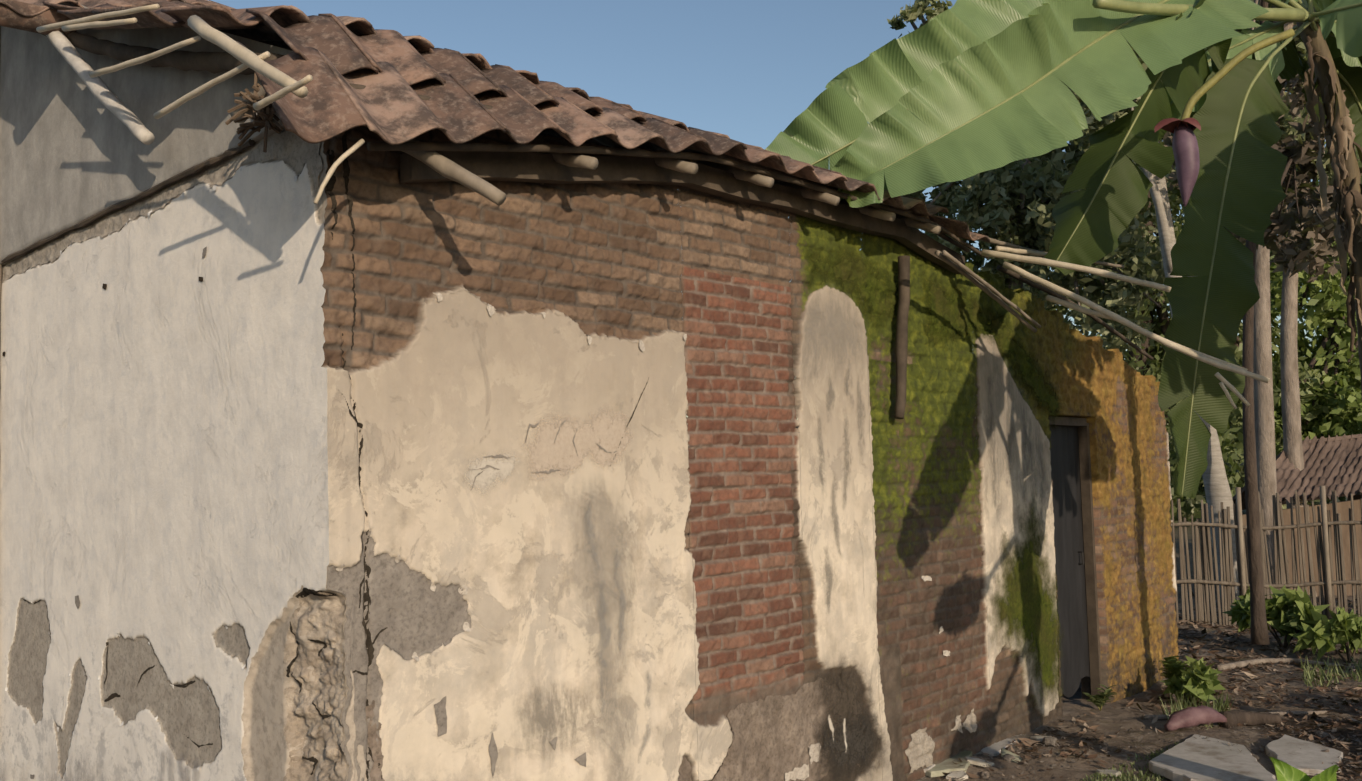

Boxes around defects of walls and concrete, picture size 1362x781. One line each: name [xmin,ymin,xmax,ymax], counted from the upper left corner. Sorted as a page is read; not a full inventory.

crack [341,333,388,781]
peeling [5,598,222,779]
spalling [212,531,471,781]
spalling [678,756,692,781]
spalling [709,677,837,781]